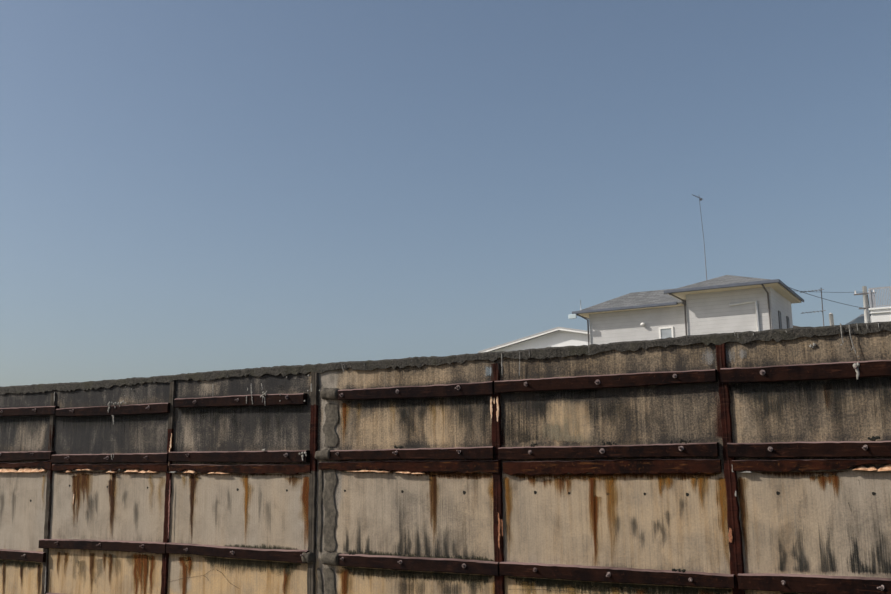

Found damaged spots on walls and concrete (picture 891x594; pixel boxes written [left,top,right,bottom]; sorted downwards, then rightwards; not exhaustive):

damp [0,385,166,430]
damp [177,374,321,432]
damp [342,395,488,433]
corrosion [59,472,163,531]
corrosion [131,554,155,594]
corrosion [174,473,309,539]
damp [395,509,474,559]
corrosion [379,470,728,555]
corrosion [738,478,748,543]
corrosion [754,471,845,490]
damp [779,532,837,572]
damp [847,527,891,574]